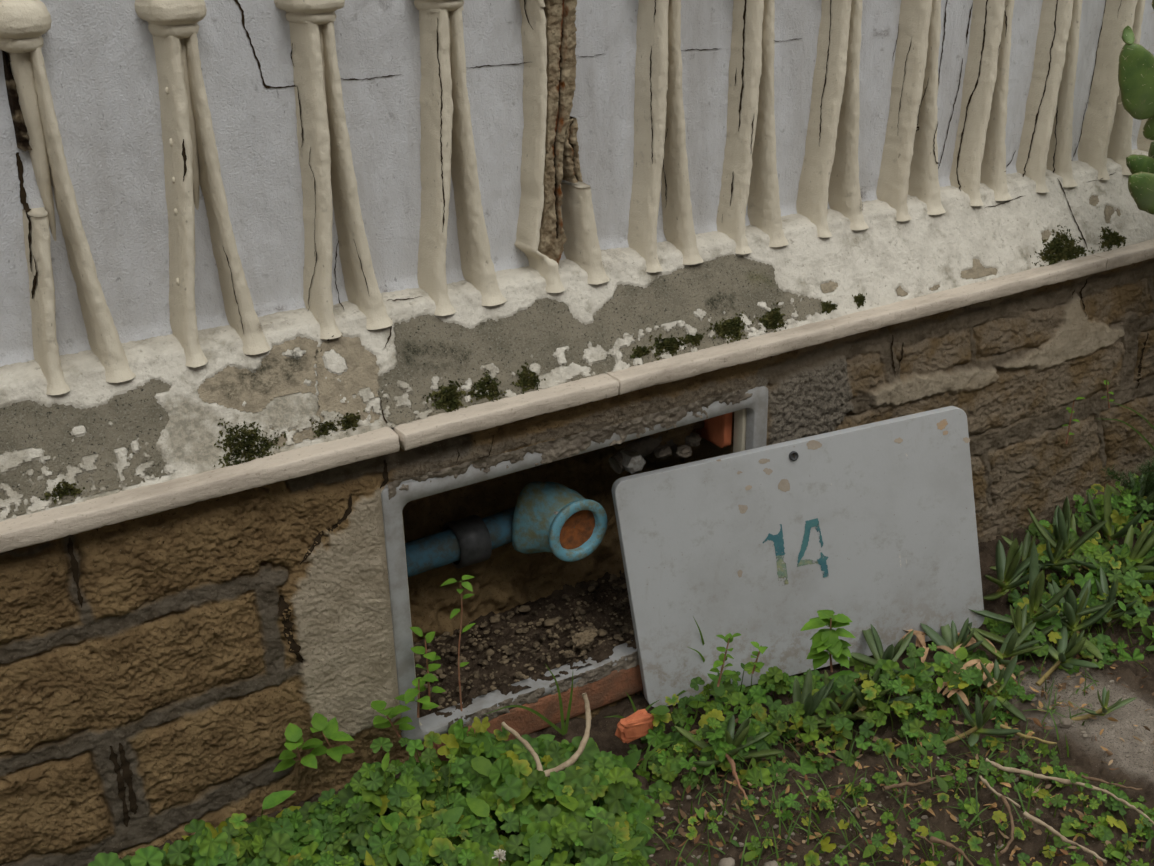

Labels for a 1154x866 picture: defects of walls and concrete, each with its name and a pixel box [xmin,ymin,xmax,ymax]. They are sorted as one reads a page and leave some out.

crack [16,152,38,299]
crack [223,248,244,332]
crack [234,0,423,347]
peeling [197,254,838,447]
spalling [538,0,583,265]
peeling [0,379,177,519]